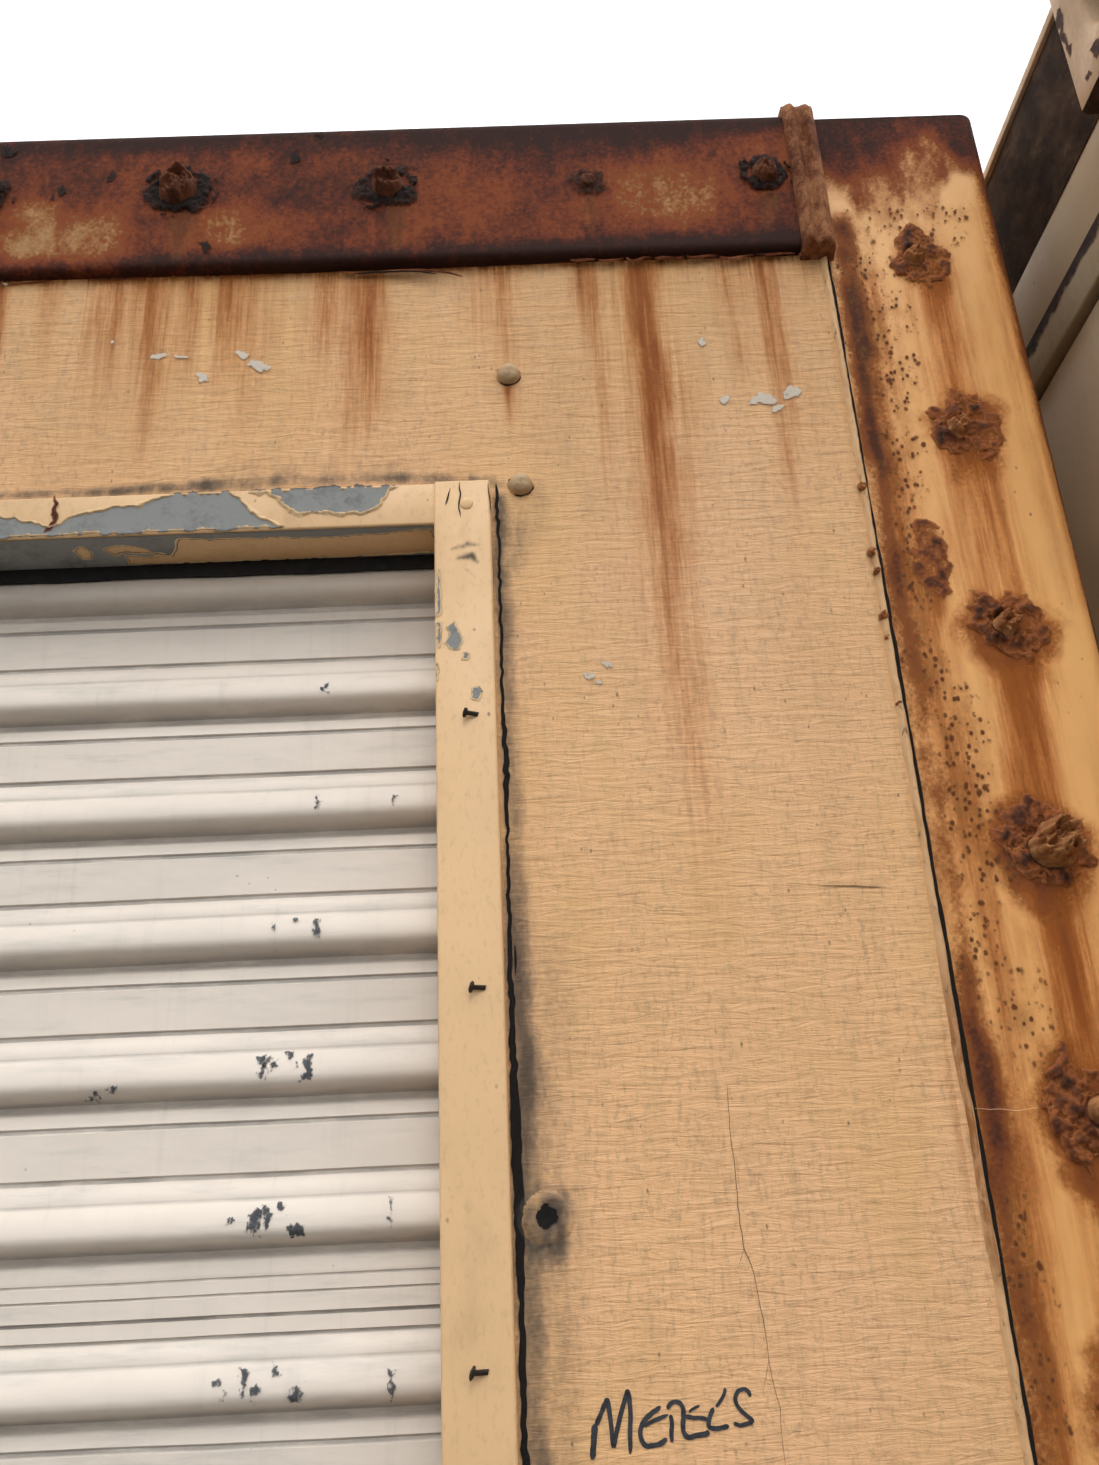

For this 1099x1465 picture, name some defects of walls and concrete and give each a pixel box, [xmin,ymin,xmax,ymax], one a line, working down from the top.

rust [0,117,802,537]
peeling [150,353,209,382]
peeling [235,350,271,372]
peeling [748,385,802,412]
peeling [0,484,470,681]
peeling [470,686,483,701]
rust [814,115,1099,1465]